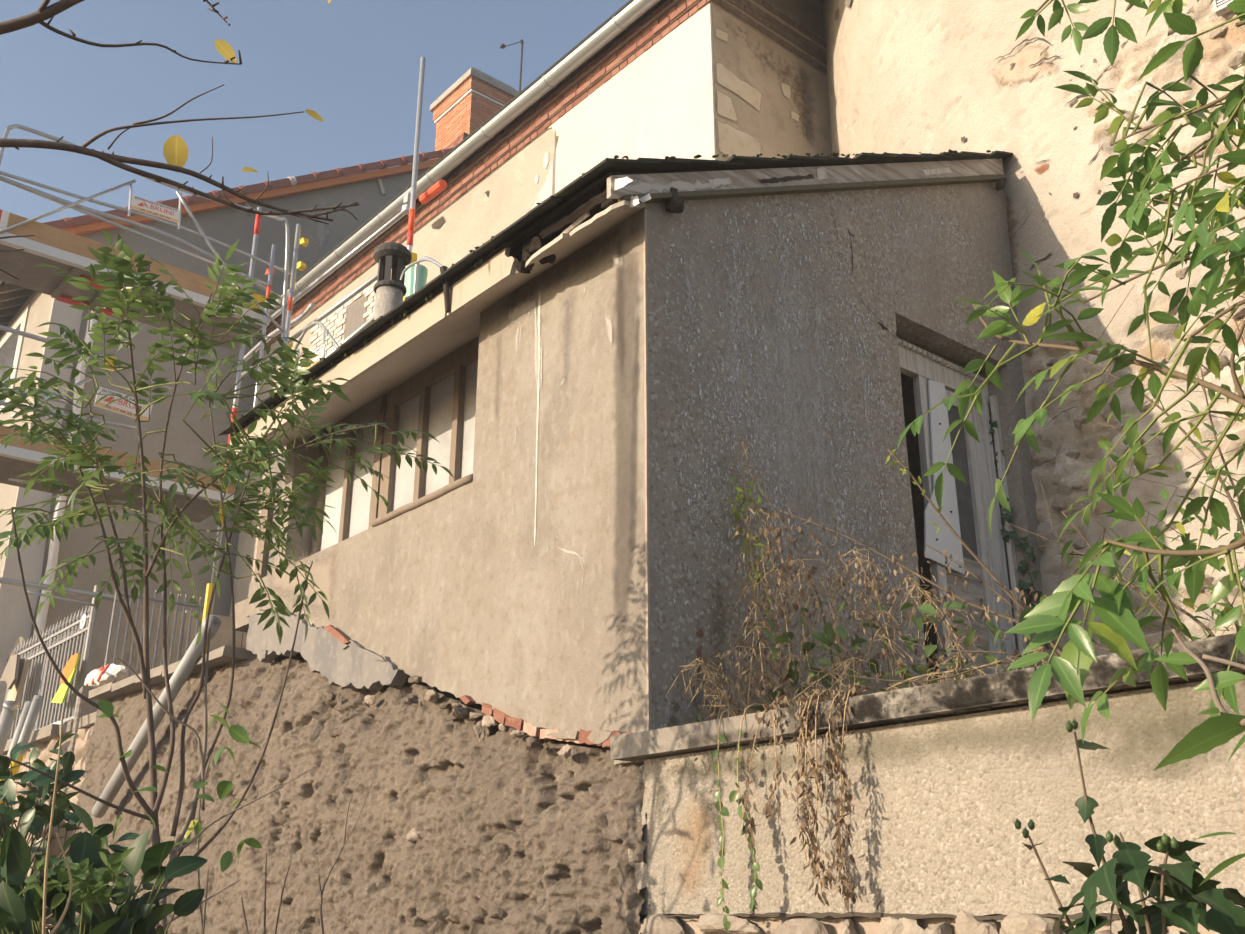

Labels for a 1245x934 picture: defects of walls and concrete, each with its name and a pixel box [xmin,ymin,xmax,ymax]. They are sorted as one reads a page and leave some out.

spalling [993,37,1062,85]
peeling [323,625,386,661]
leakage [1088,643,1234,686]
leakage [803,695,900,730]
leakage [920,669,1031,713]